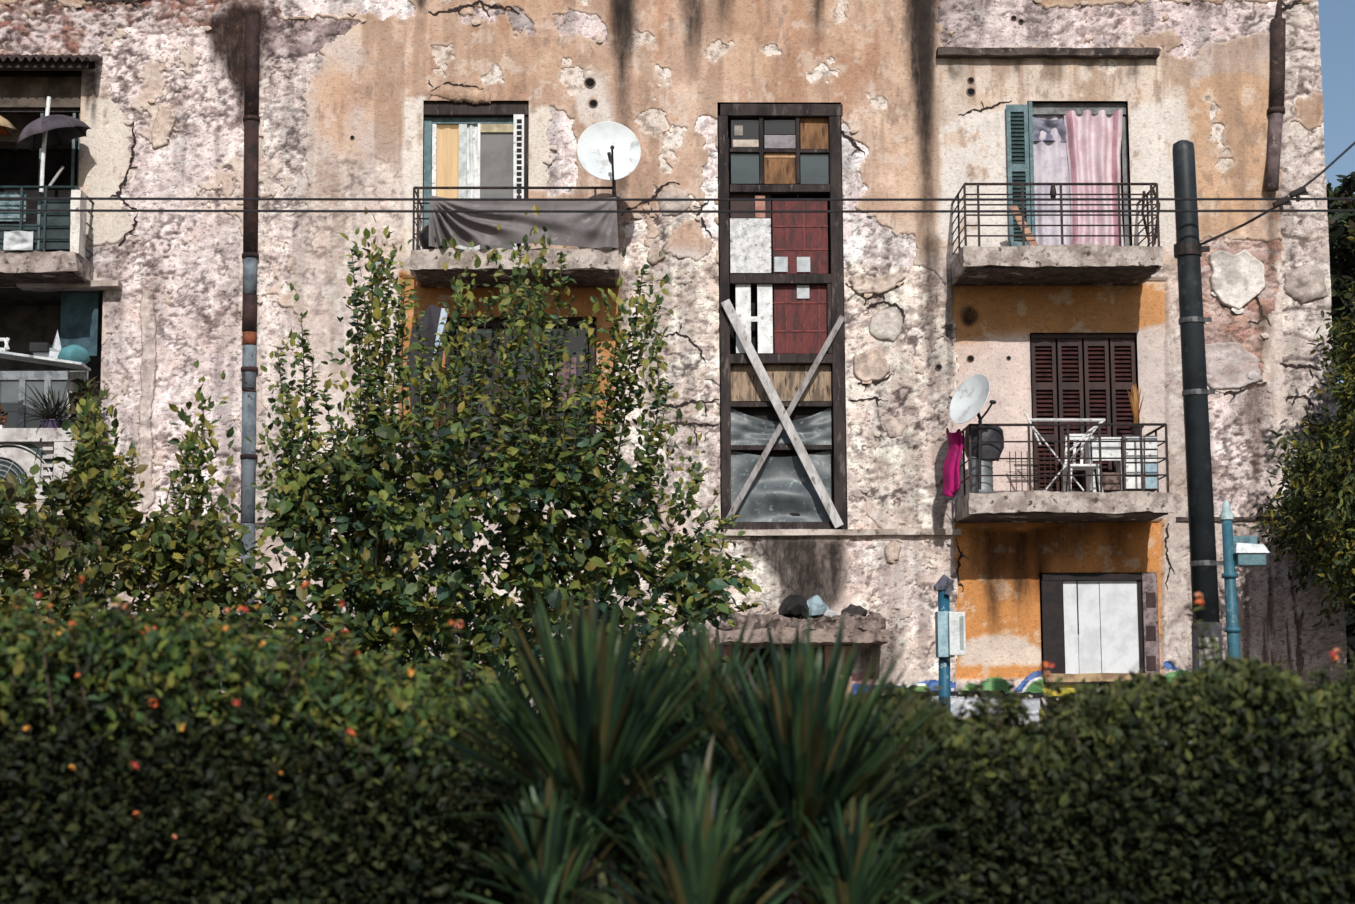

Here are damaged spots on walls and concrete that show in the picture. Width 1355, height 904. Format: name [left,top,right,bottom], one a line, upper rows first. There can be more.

crack [428,0,520,17]
flaking render [553,0,655,51]
leakage [613,0,632,82]
leakage [686,0,701,45]
flaking render [559,58,598,108]
leakage [908,0,936,191]
crack [110,122,138,247]
flaking render [543,106,578,198]
flaking render [0,0,415,530]
flaking render [936,0,1347,692]
leakage [751,536,843,605]
leakage [986,530,1042,609]